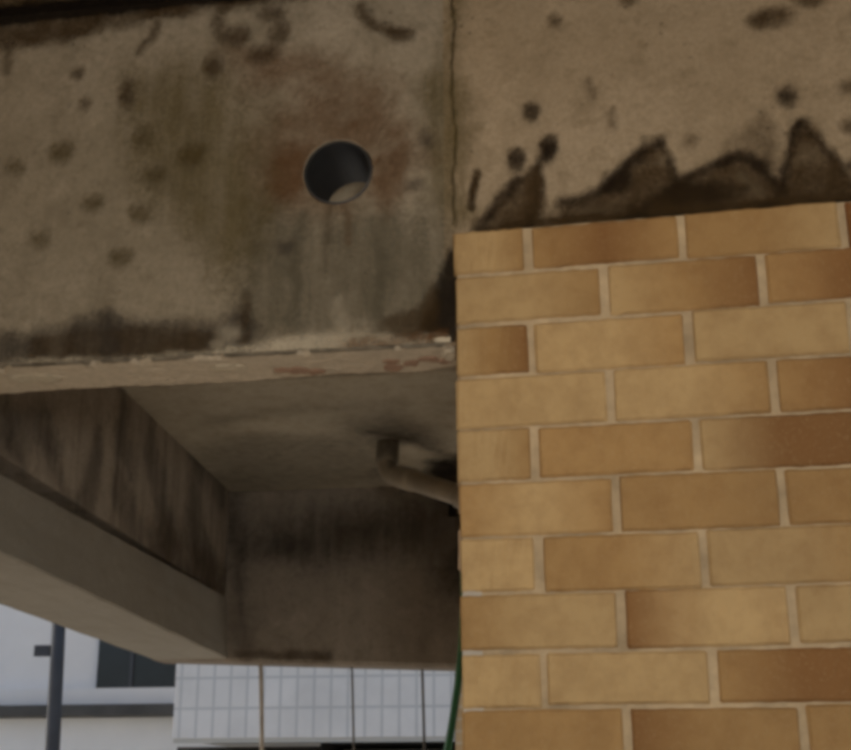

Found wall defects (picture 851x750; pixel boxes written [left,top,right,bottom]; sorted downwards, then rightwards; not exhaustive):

leakage [0,0,280,47]
leakage [524,103,539,119]
leakage [778,86,796,105]
leakage [475,119,851,231]
leakage [64,275,258,360]